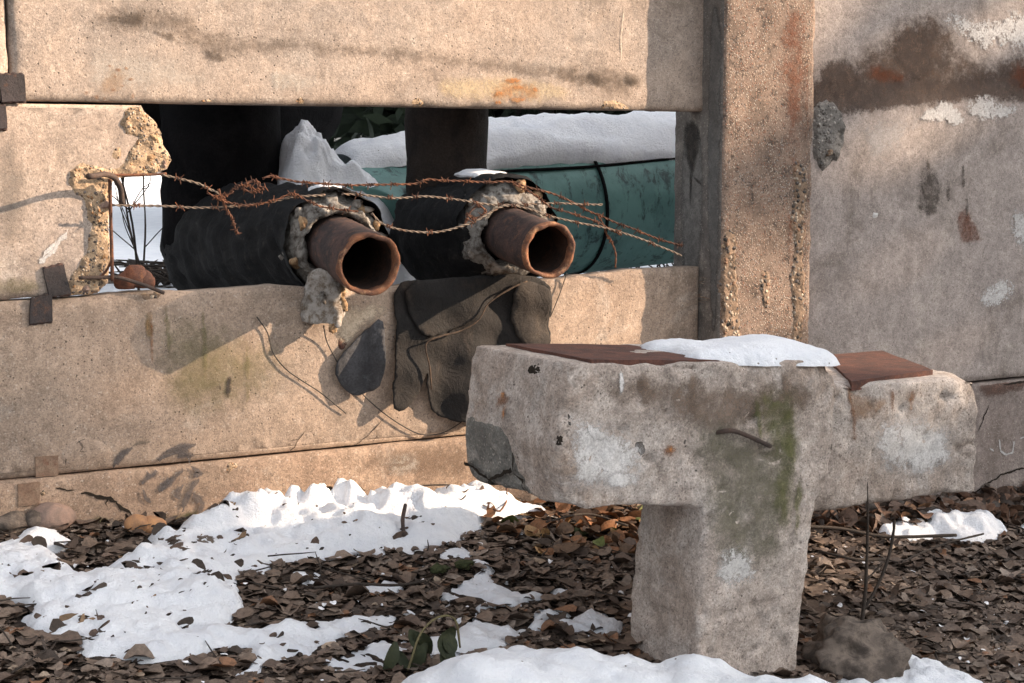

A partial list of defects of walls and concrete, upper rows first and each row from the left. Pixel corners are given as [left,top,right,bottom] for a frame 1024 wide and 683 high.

water stain [813,13,1024,115]
spalling [68,107,171,300]
water stain [918,156,950,215]
rust [957,165,979,242]
spalling [465,417,532,494]
water stain [572,423,640,487]
water stain [609,373,808,461]